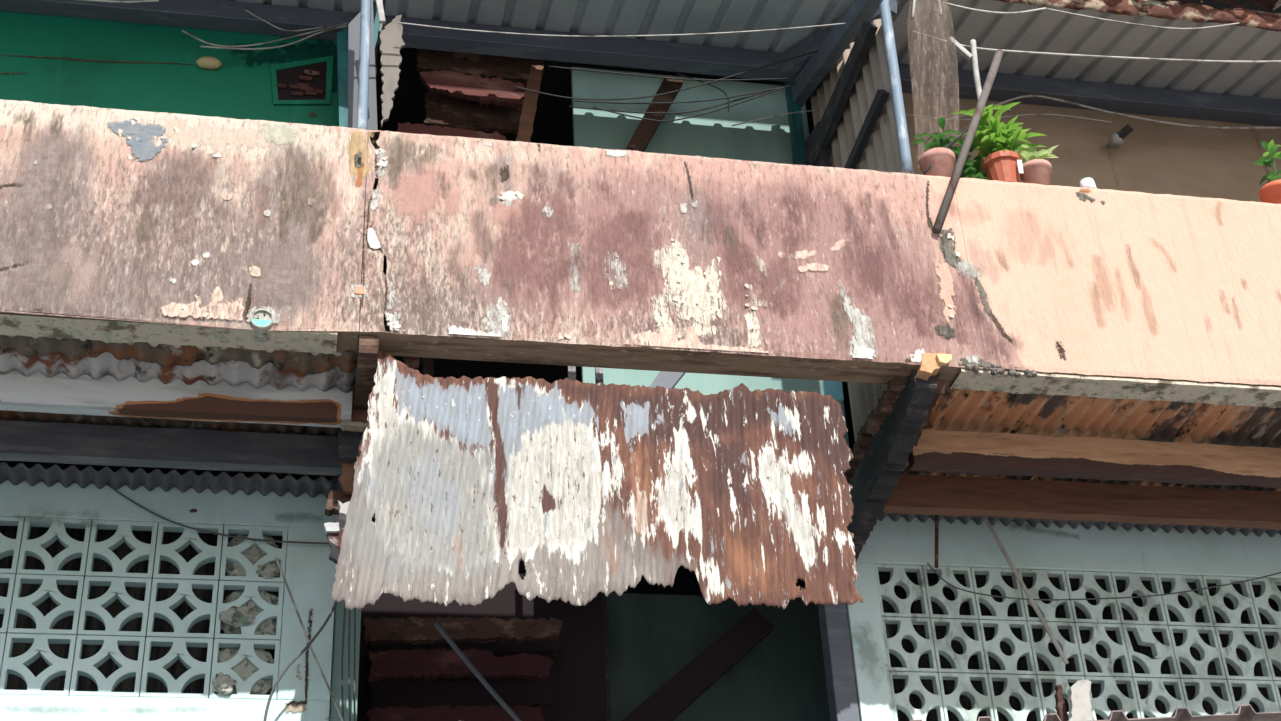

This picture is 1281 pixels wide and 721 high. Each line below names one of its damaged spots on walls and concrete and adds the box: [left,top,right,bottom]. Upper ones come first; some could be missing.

peeling [107,117,273,202]
peeling [160,286,244,320]
crack [361,132,391,332]
peeling [604,252,628,290]
peeling [624,238,785,353]
peeling [778,238,850,272]
peeling [839,284,877,359]
crack [926,181,1013,343]